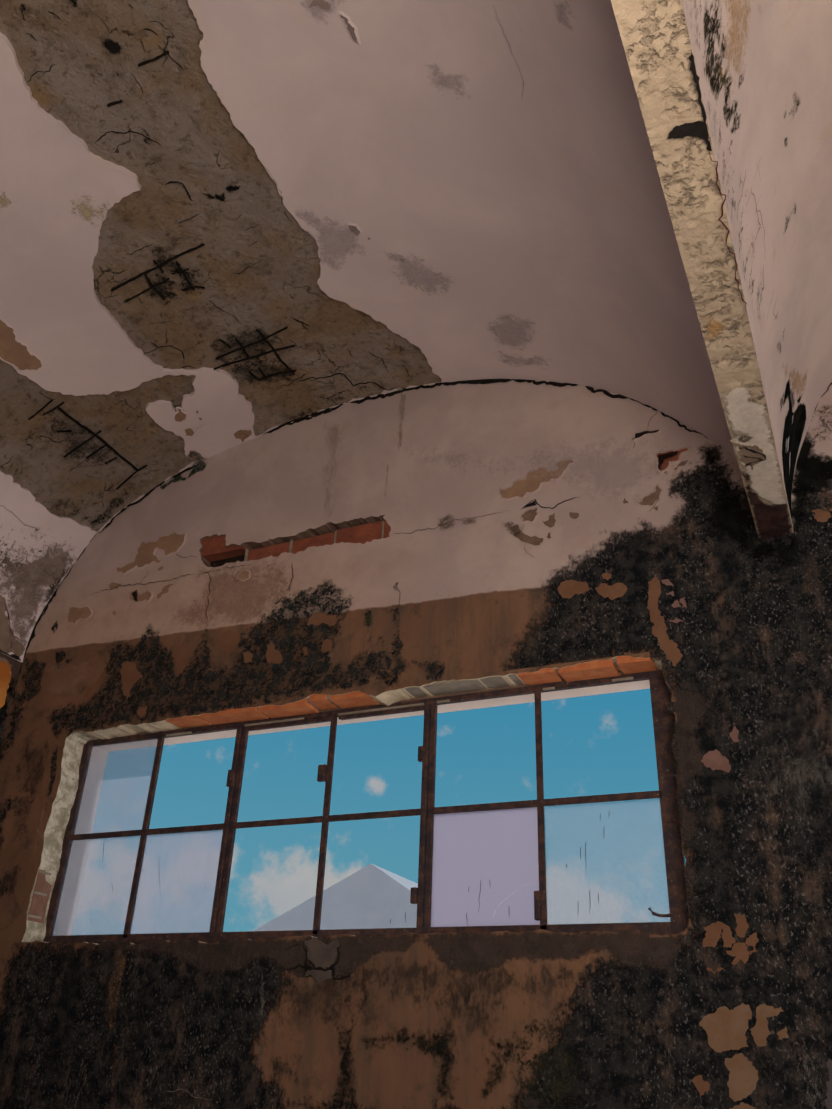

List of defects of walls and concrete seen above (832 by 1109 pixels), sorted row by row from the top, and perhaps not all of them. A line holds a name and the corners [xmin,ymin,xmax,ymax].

leakage [690,2,754,292]
spalling [0,0,442,532]
crack [263,379,708,448]
crack [0,461,202,676]
crack [98,564,252,623]
leakage [17,581,445,848]
flaking render [109,520,391,604]
crack [392,510,521,535]
flaking render [405,577,687,698]
leakage [502,406,832,1109]
leakage [0,940,513,1109]
peeling [699,1003,789,1109]